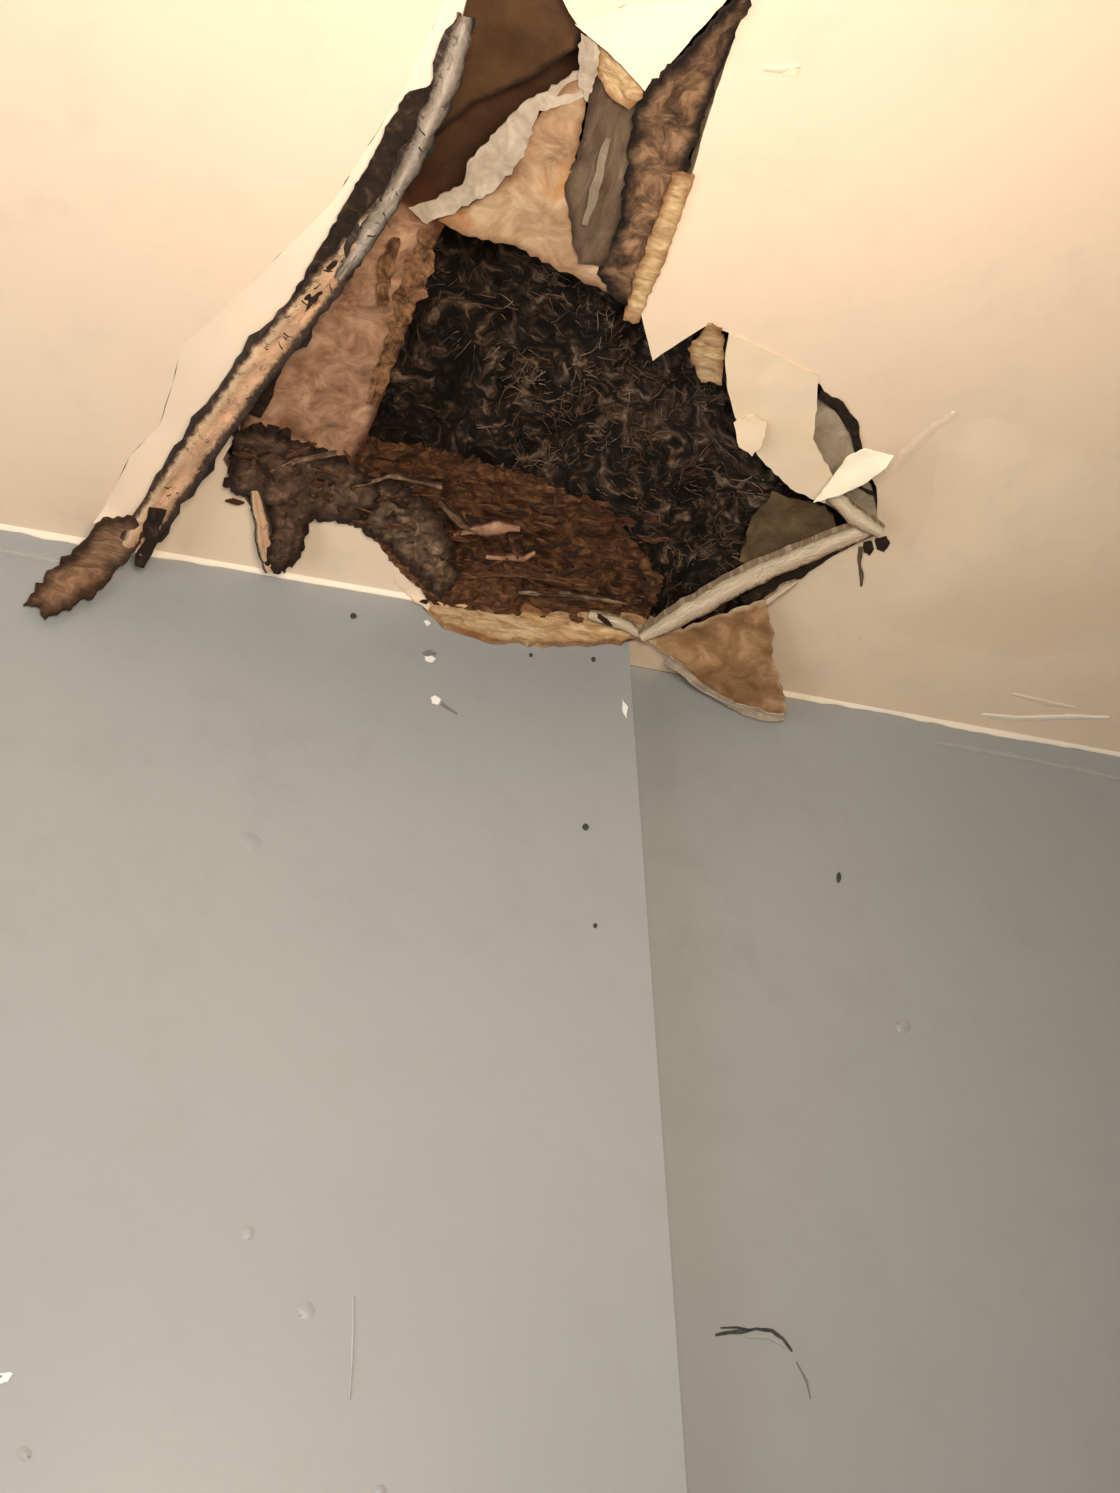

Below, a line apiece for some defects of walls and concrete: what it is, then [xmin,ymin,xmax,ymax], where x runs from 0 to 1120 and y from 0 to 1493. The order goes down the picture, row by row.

peeling [725,332,833,503]
spalling [637,514,890,643]
peeling [422,650,437,663]
crack [715,1326,811,1399]